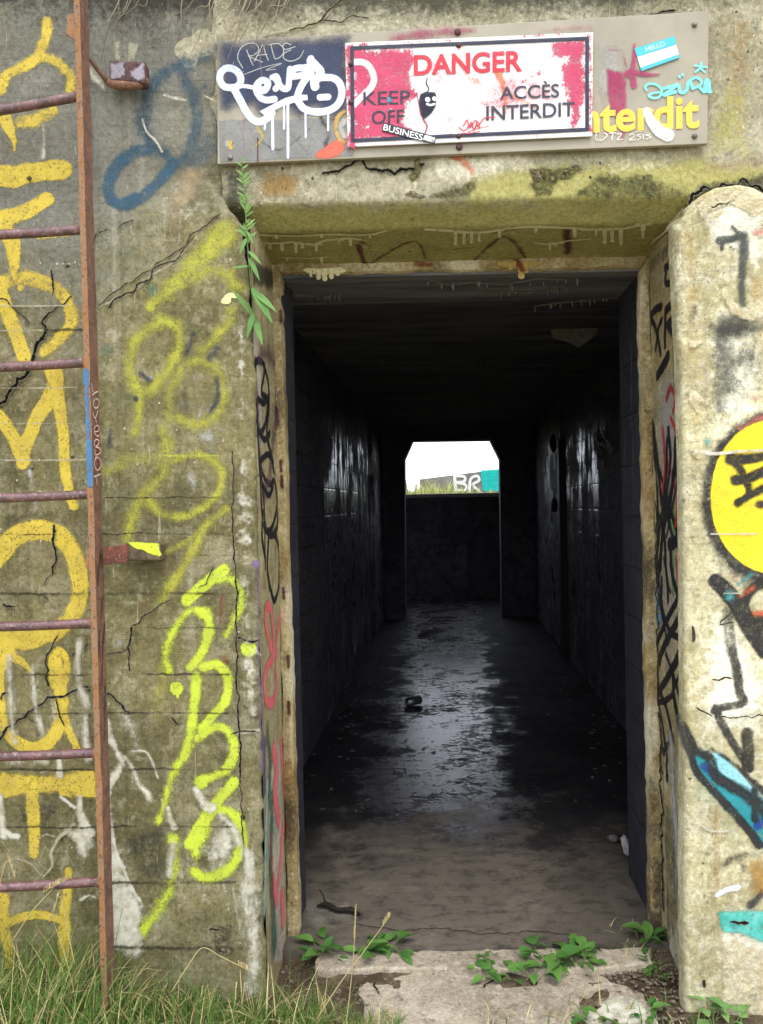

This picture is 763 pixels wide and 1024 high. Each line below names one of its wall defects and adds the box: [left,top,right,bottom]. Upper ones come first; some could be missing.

crack [321,160,425,176]
crack [94,213,221,309]
leakage [594,228,623,245]
crack [0,270,72,406]
crack [44,524,58,601]
crack [0,599,172,741]
crack [198,450,260,859]
crack [356,923,579,936]